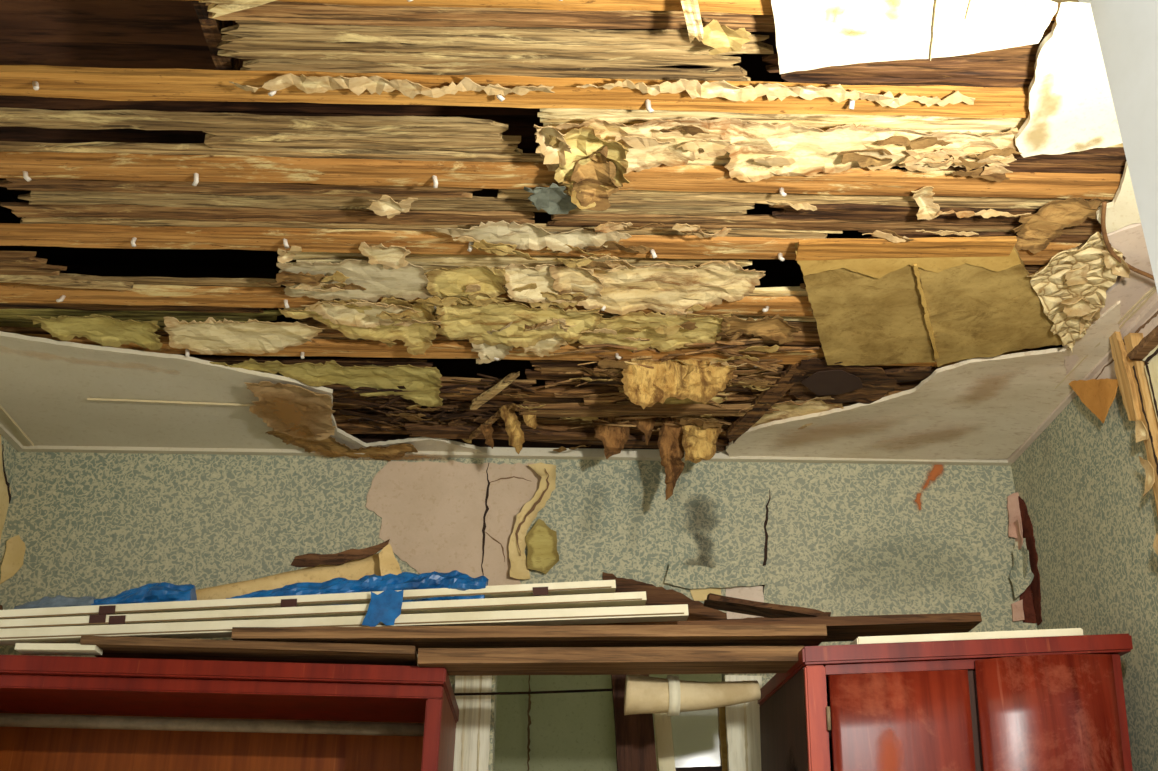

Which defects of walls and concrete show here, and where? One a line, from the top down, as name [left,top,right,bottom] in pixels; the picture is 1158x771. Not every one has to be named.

peeling [523,117,1019,214]
peeling [1027,232,1130,353]
flaking render [1092,357,1117,379]
flaking render [1135,308,1158,337]
flaking render [365,460,542,586]
crack [481,463,529,575]
crack [762,490,771,595]
spalling [1007,492,1042,625]